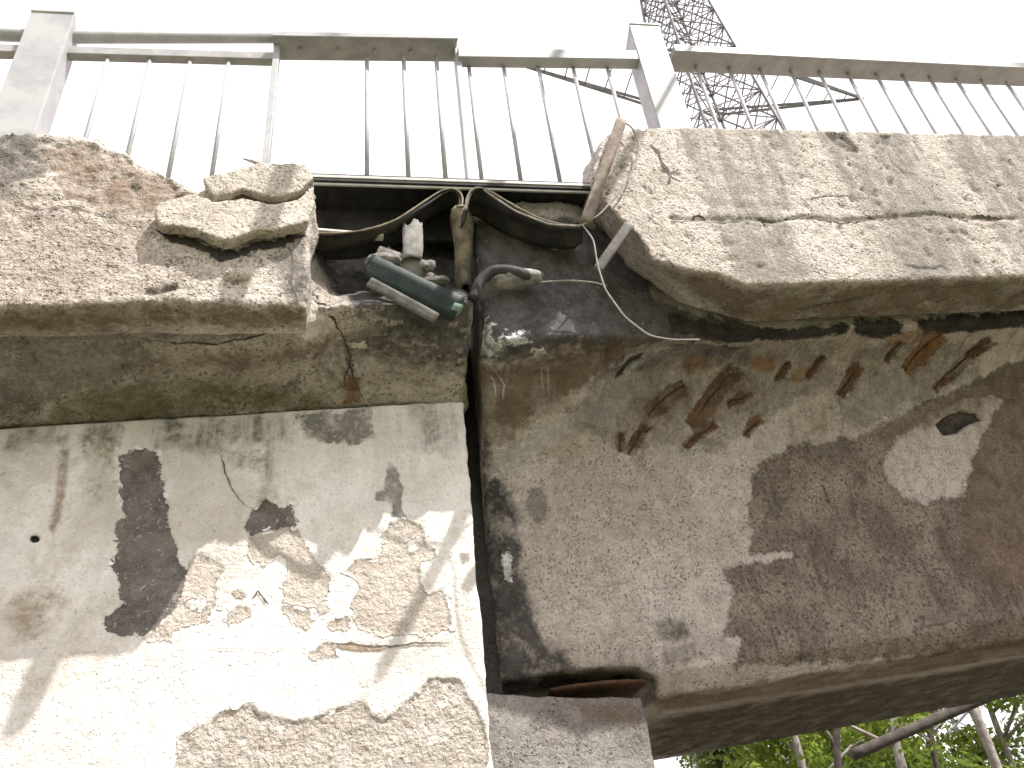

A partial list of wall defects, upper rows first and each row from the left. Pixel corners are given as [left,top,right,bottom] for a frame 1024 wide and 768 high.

peeling [46,146,315,250]
crack [648,194,1022,224]
crack [154,230,365,401]
peeling [241,468,456,663]
damp [481,361,1024,711]
peeling [173,675,490,768]